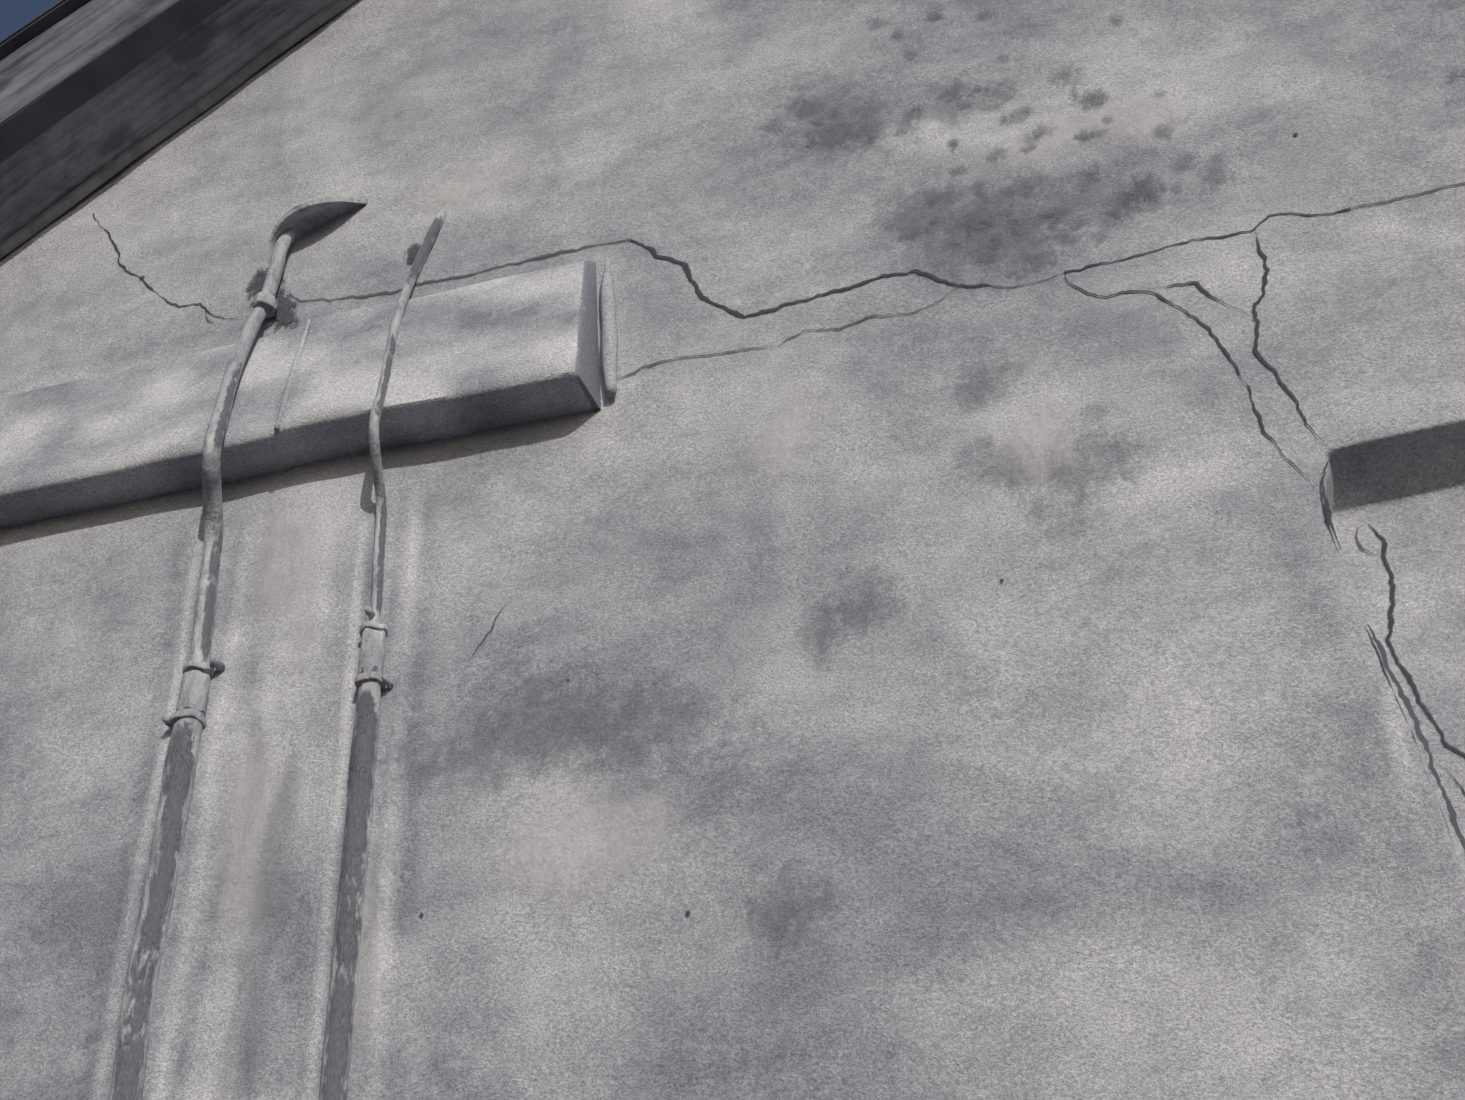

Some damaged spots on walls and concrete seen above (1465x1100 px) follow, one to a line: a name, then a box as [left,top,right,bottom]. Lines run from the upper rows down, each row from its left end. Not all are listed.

crack [93,213,236,324]
crack [291,182,1465,850]